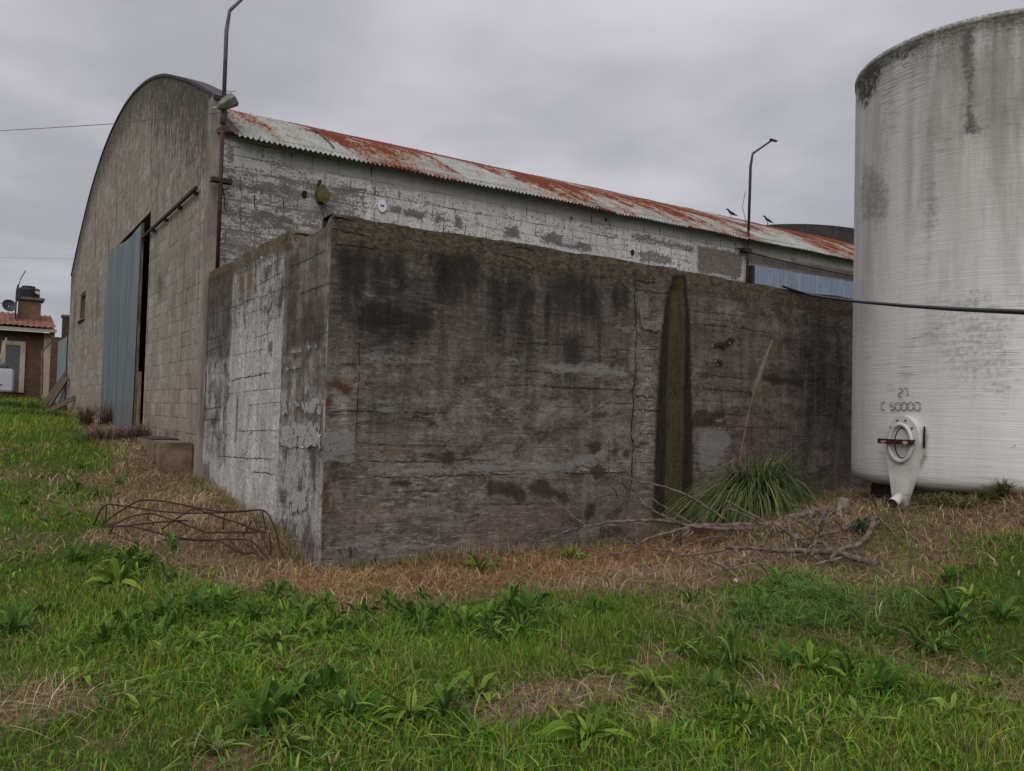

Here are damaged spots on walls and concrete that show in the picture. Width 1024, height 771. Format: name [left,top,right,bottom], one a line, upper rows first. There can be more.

damp [857,42,921,109]
damp [962,28,976,132]
peeling [390,204,464,229]
peeling [503,225,521,239]
peeling [541,231,593,251]
peeling [630,233,743,278]